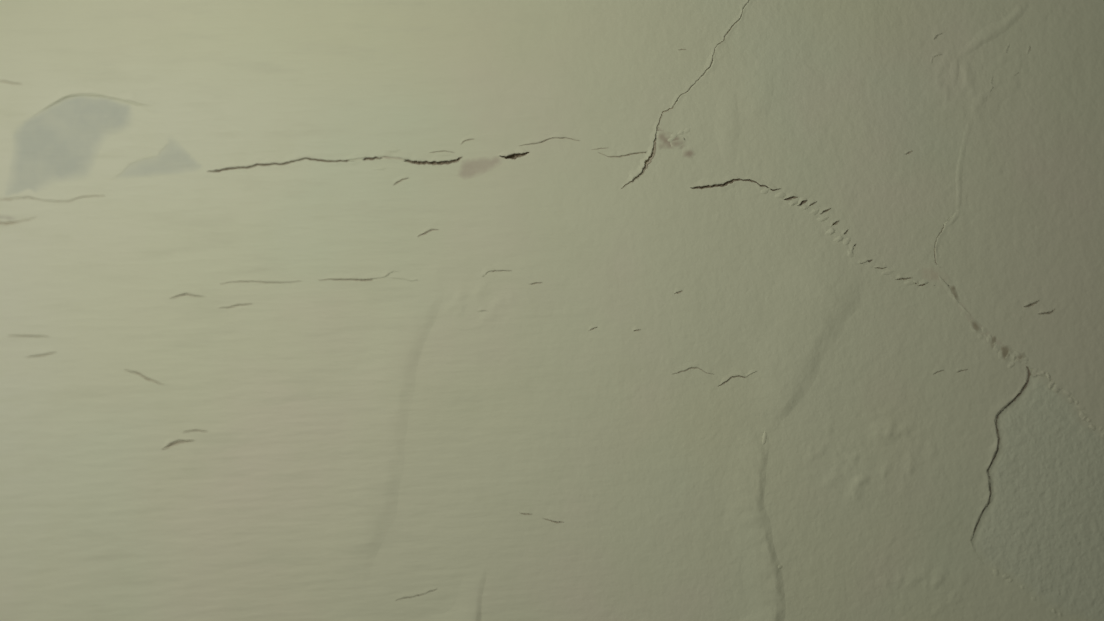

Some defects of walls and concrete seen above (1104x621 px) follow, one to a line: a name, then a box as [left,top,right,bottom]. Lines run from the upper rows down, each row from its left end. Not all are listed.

crack [496,0,755,189]
peeling [3,82,204,198]
crack [207,147,463,174]
crack [0,189,105,232]
crack [220,267,418,284]
crack [671,360,757,387]
crack [690,174,1031,540]